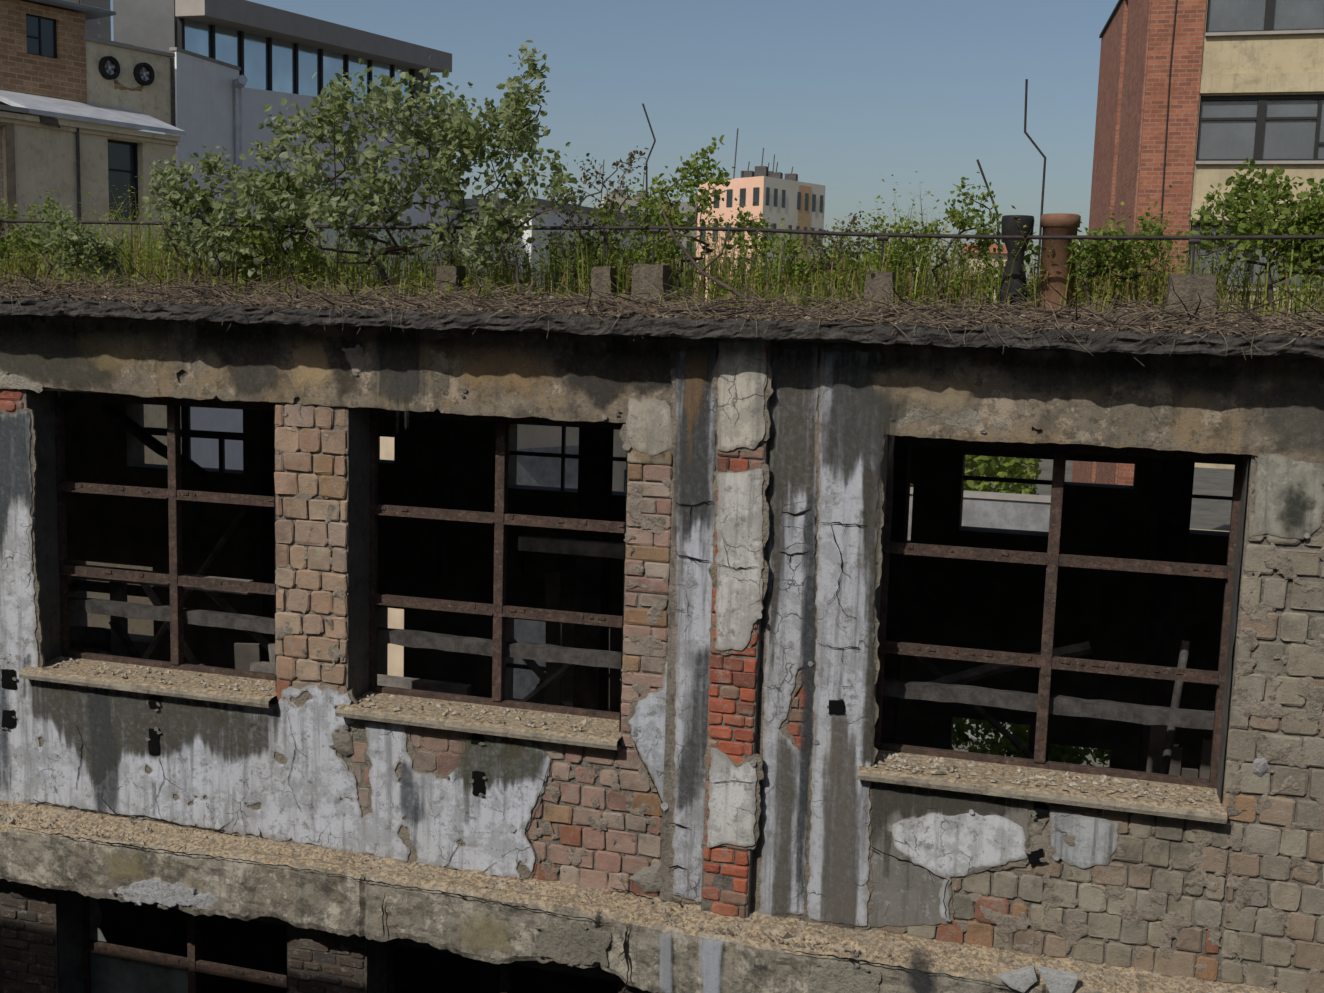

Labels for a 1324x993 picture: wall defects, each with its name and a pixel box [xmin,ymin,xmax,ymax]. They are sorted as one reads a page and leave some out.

water stain [0,411,31,551]
spalling [0,371,43,393]
water stain [0,324,112,387]
spalling [342,344,365,378]
crack [676,501,712,523]
water stain [1255,383,1324,450]
flaking render [0,408,554,878]
crack [677,509,867,687]
flaking render [602,339,1120,931]
water stain [768,348,1022,925]
water stain [24,680,279,813]
peeling [999,965,1079,993]